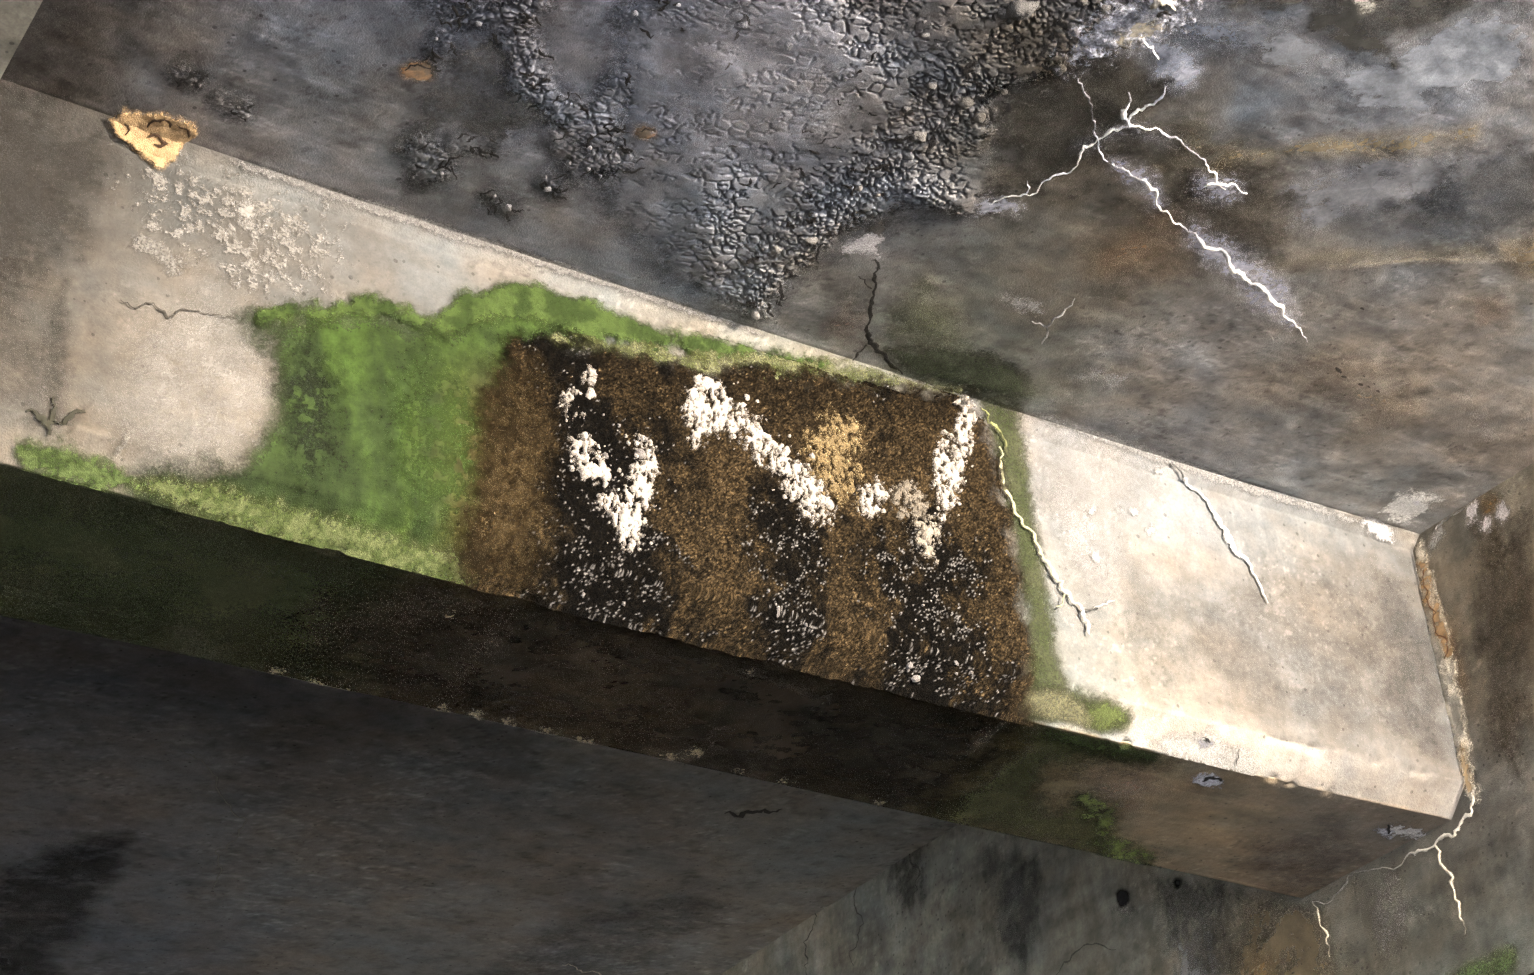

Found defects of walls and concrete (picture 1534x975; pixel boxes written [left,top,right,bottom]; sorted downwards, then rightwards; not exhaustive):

water stain [0,328,86,435]
corrosion [108,112,198,168]
corrosion [401,62,433,81]
spalling [396,0,1125,329]
crack [853,259,903,375]
crack [982,79,1307,344]
water stain [255,331,1046,820]
crack [981,408,1115,634]
crack [1171,462,1269,603]
crack [1311,542,1478,957]